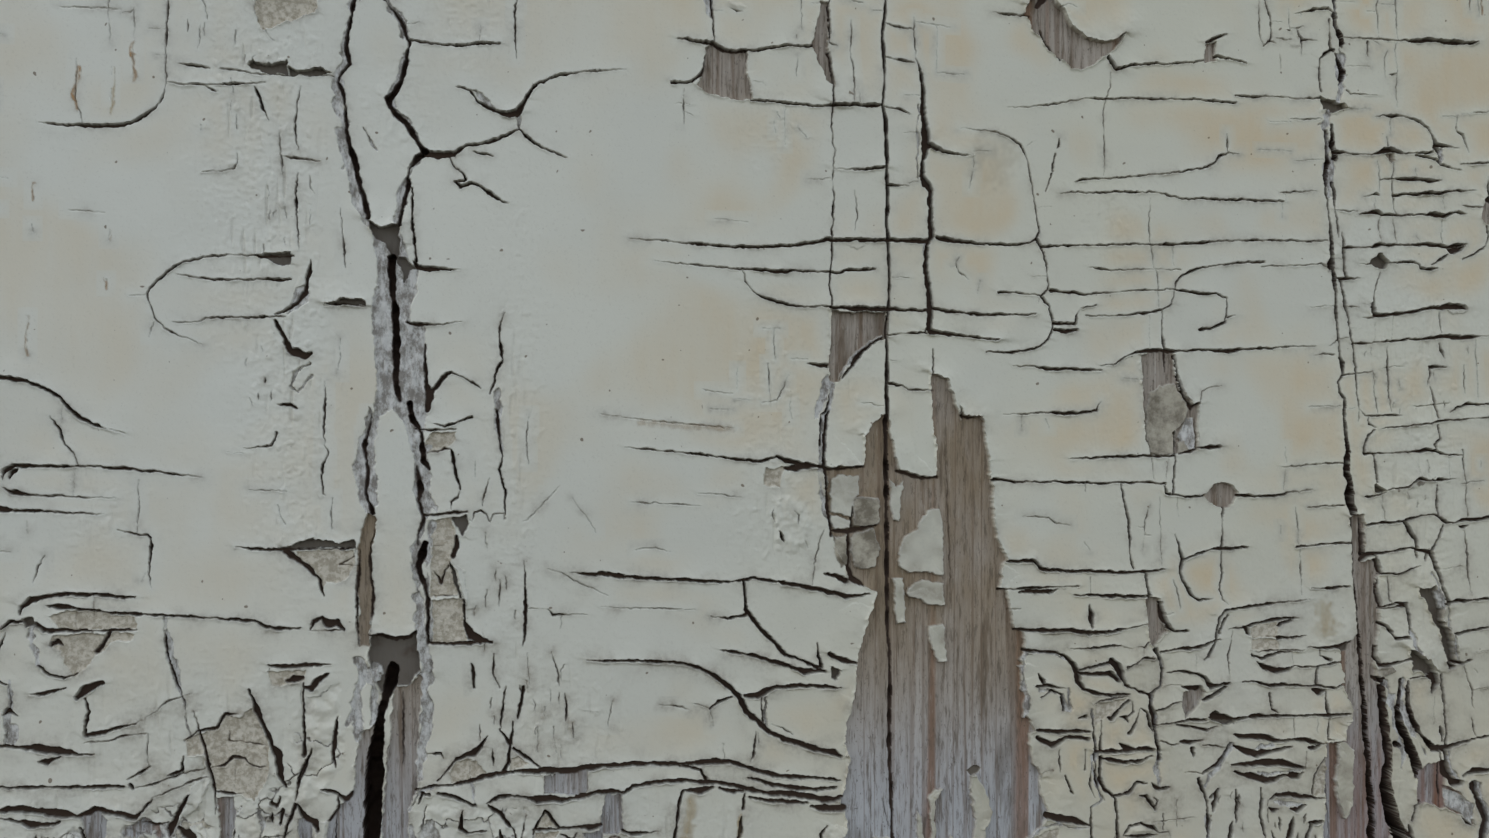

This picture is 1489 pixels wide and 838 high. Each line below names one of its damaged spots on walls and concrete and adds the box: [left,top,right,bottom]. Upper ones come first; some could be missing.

peeling [670,0,832,101]
peeling [991,0,1127,71]
peeling [234,537,358,598]
crack [0,0,628,838]
peeling [272,161,1090,838]
crack [457,0,1489,838]
peeling [1100,345,1317,454]
peeling [0,657,385,838]